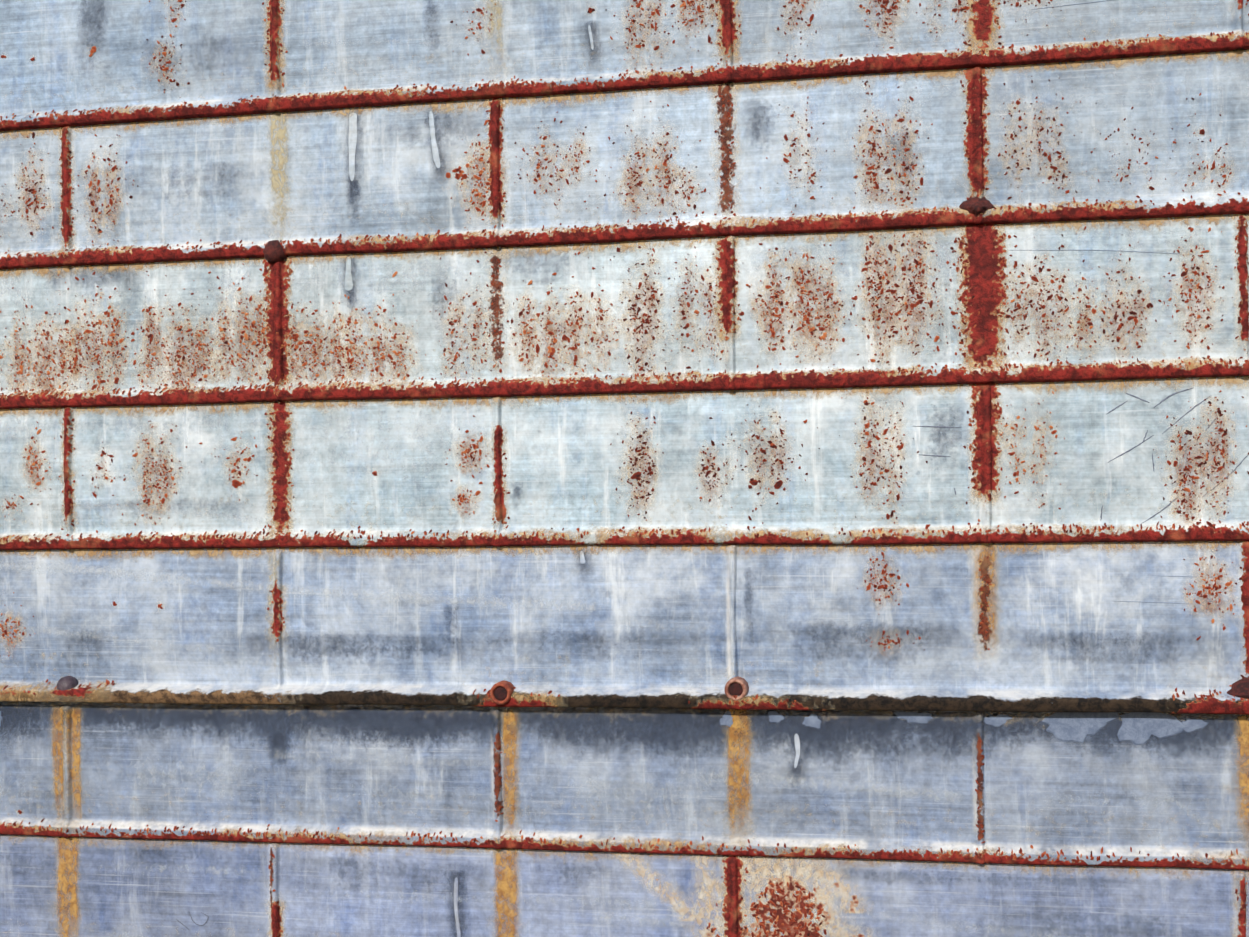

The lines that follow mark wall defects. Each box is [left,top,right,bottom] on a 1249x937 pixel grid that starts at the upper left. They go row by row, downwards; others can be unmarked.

rust [0,679,1249,937]